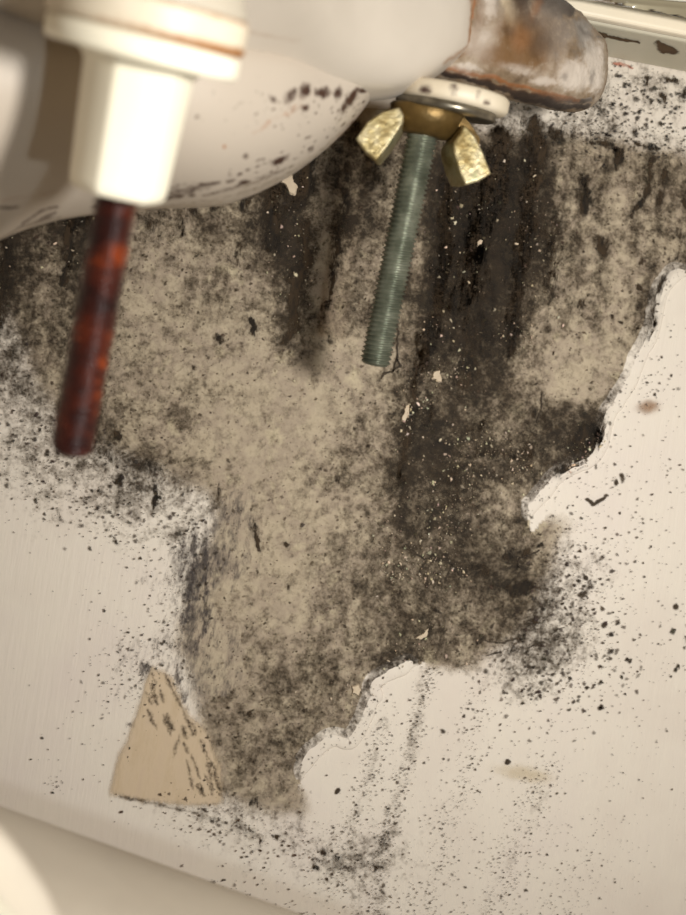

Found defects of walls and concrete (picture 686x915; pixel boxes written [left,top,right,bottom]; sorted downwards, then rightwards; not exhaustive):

peeling [11,226,85,405]
damp [0,120,408,714]
peeling [99,108,686,811]
damp [163,61,686,915]